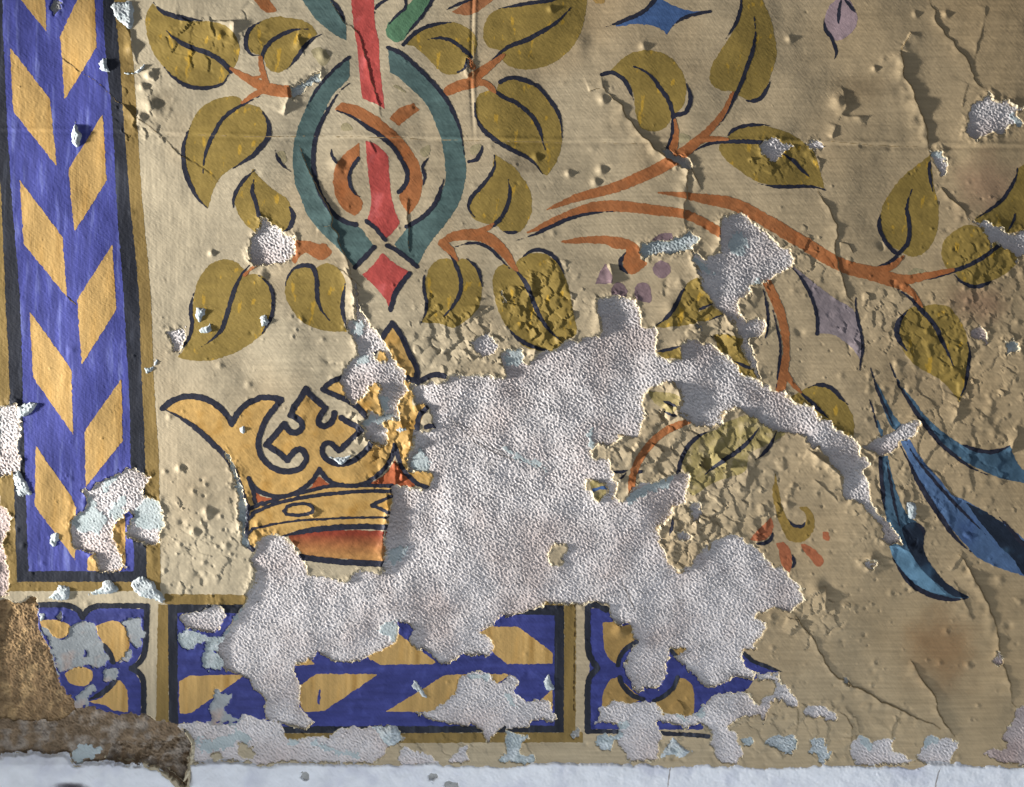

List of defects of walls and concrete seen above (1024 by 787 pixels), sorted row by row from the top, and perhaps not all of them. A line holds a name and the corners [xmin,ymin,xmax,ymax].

crack [901,32,930,153]
crack [931,5,987,107]
peeling [966,91,1024,142]
peeling [0,212,921,787]
crack [795,615,955,737]
crack [959,555,1016,707]